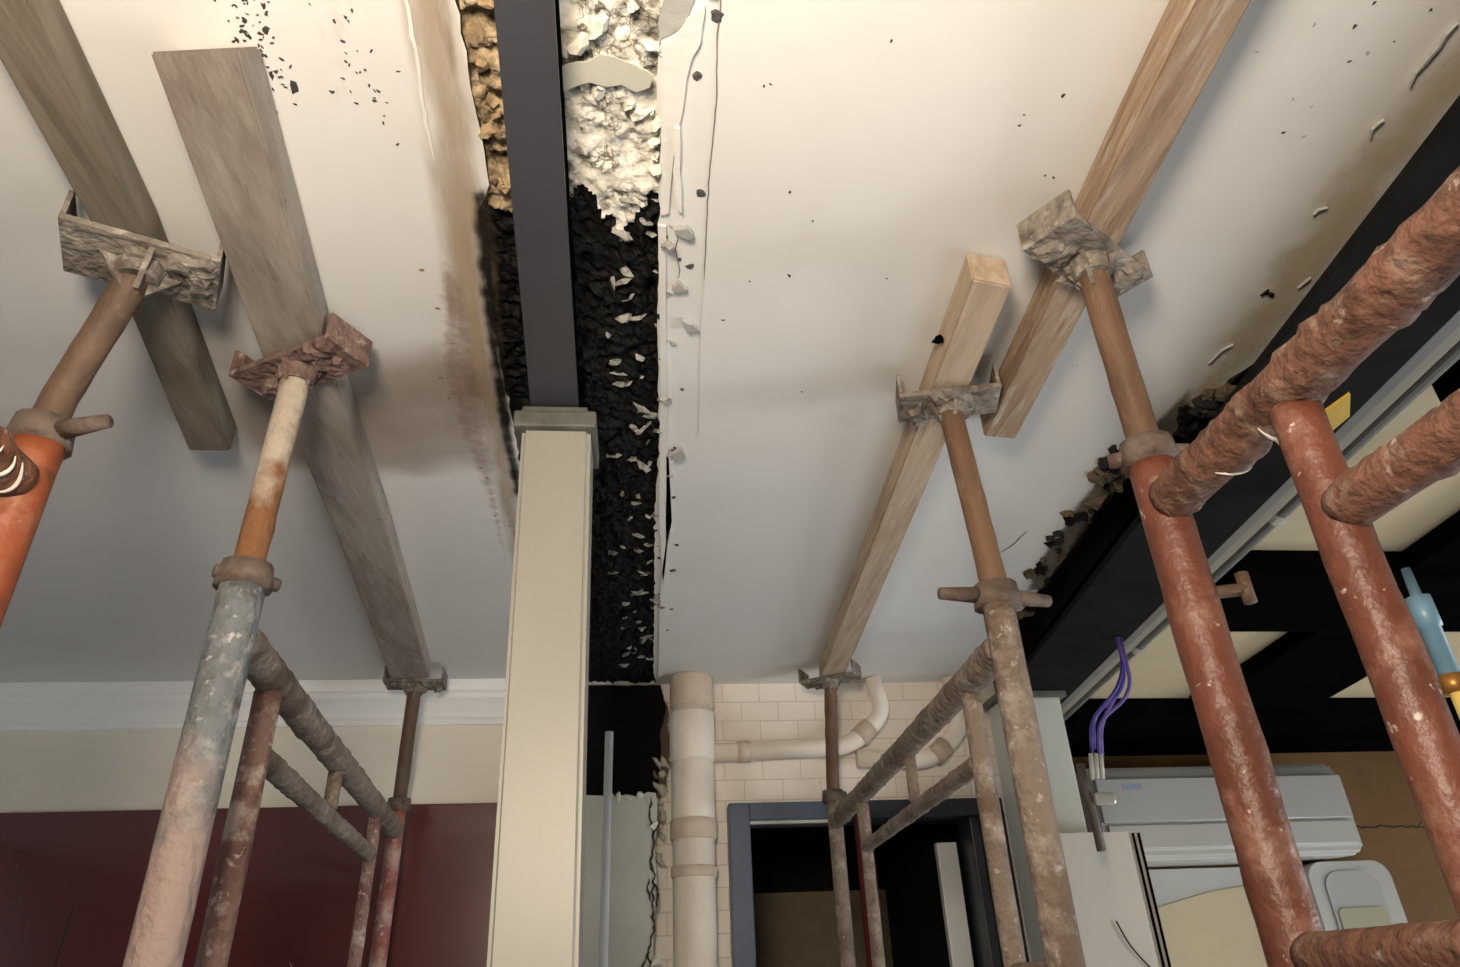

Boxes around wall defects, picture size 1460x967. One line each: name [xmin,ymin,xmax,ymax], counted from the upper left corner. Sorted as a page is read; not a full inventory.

water stain [214,0,299,115]
water stain [329,8,388,125]
water stain [1157,21,1460,435]
spalling [559,0,724,680]
flaking render [1174,382,1237,444]
flaking render [1023,444,1127,586]
water stain [1031,468,1123,590]
flaking render [1016,607,1037,620]